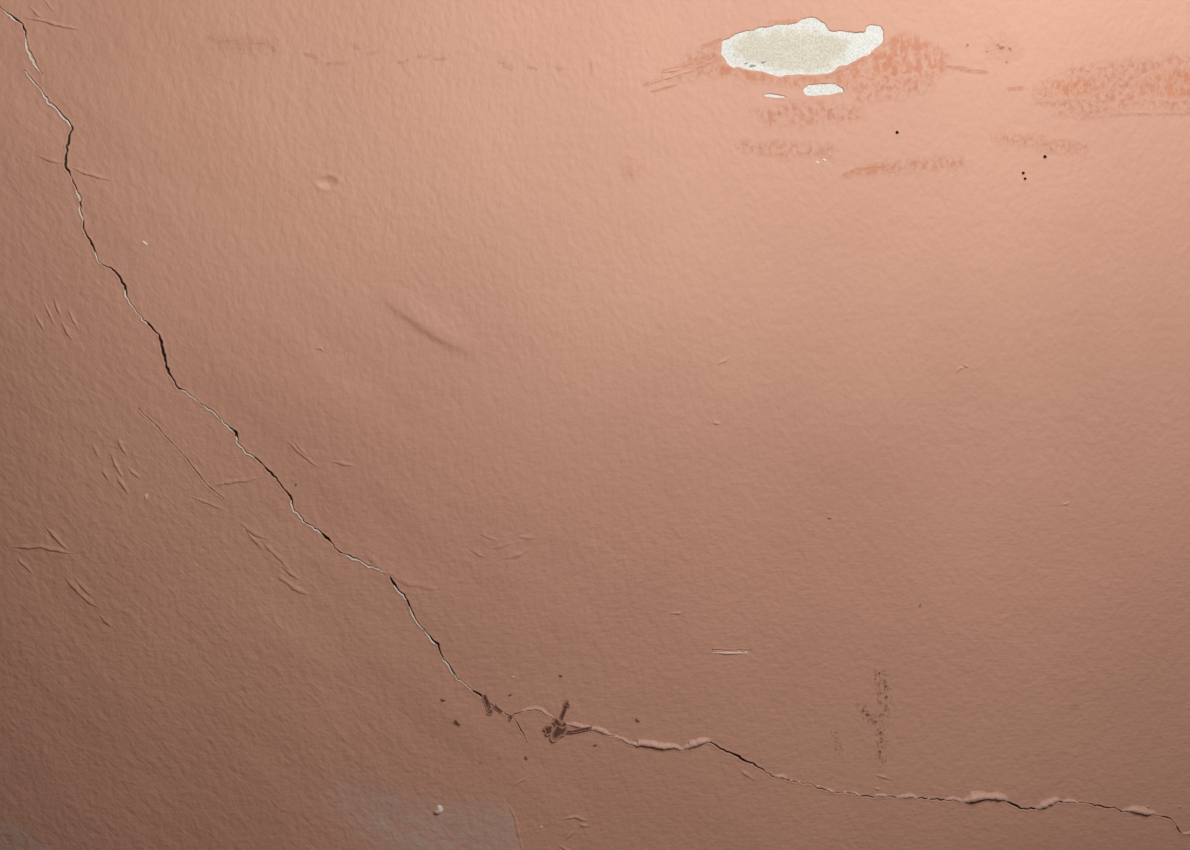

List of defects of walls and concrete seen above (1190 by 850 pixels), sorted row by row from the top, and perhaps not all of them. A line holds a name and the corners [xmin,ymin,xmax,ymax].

peeling [718,15,886,100]
crack [0,0,555,743]
crack [566,721,1190,837]